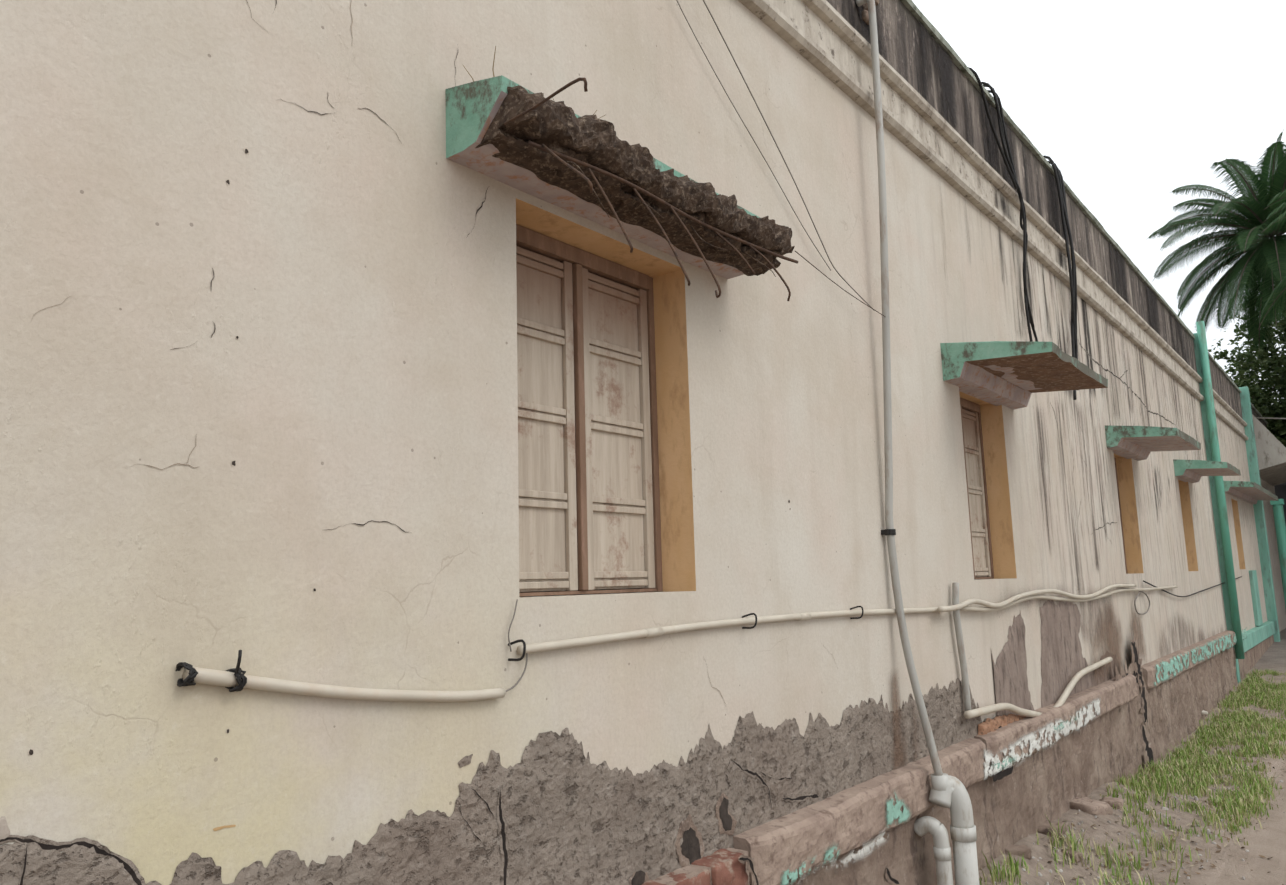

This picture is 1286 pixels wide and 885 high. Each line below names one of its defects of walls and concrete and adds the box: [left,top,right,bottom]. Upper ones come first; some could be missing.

spalling [476,78,798,301]
flaking render [0,600,1118,885]
crack [1115,633,1157,766]
crack [0,835,147,885]
crack [460,786,511,885]